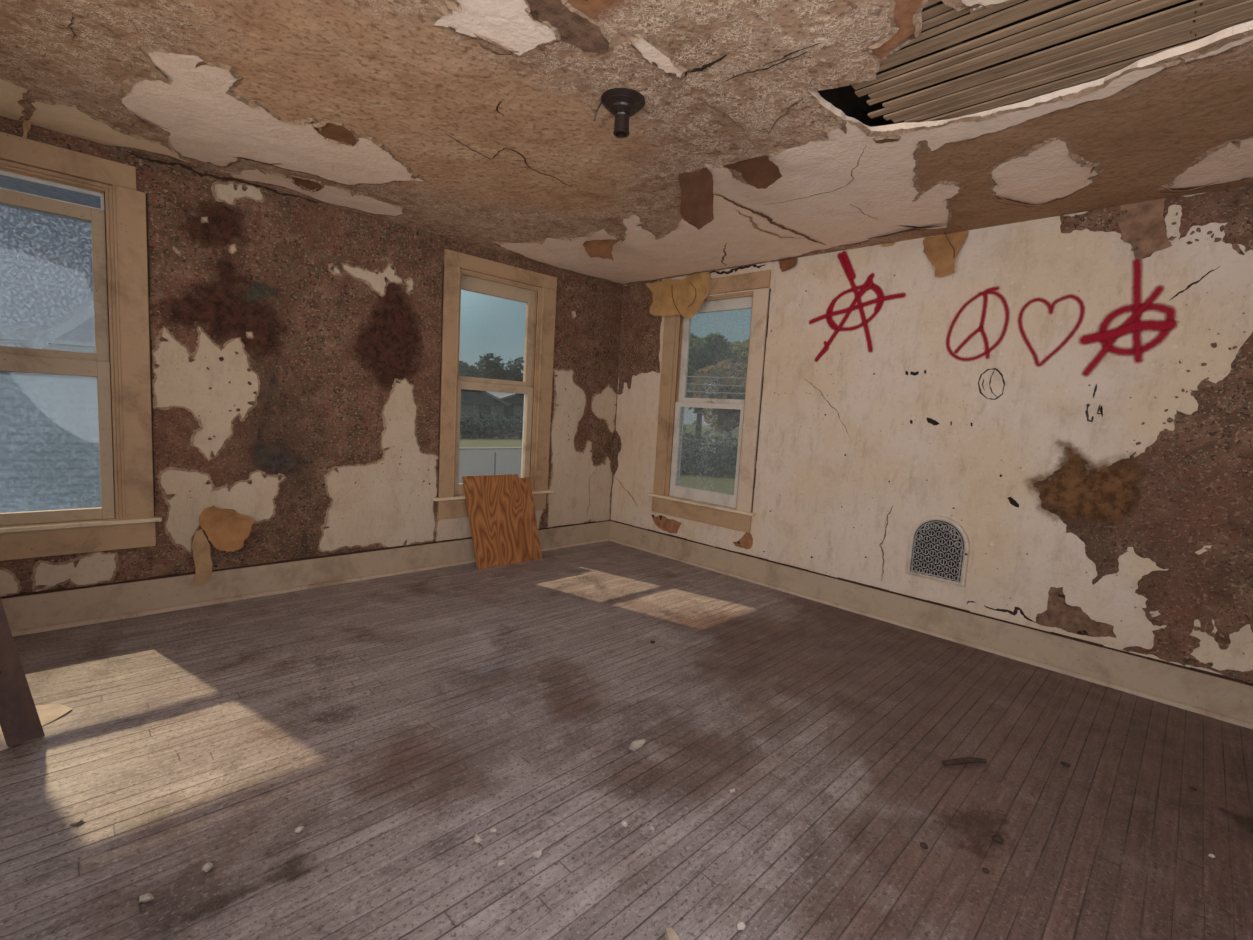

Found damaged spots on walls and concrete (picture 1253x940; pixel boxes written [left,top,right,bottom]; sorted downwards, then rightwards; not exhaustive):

peeling [0,45,426,217]
damp [186,207,245,246]
damp [171,259,287,356]
damp [356,283,421,386]
crack [448,135,571,187]
crack [709,243,765,275]
crack [714,146,879,245]
peeling [490,0,1253,529]
peeling [152,326,287,585]
crack [880,506,893,581]
damp [1029,443,1140,521]
peeling [1033,332,1253,684]